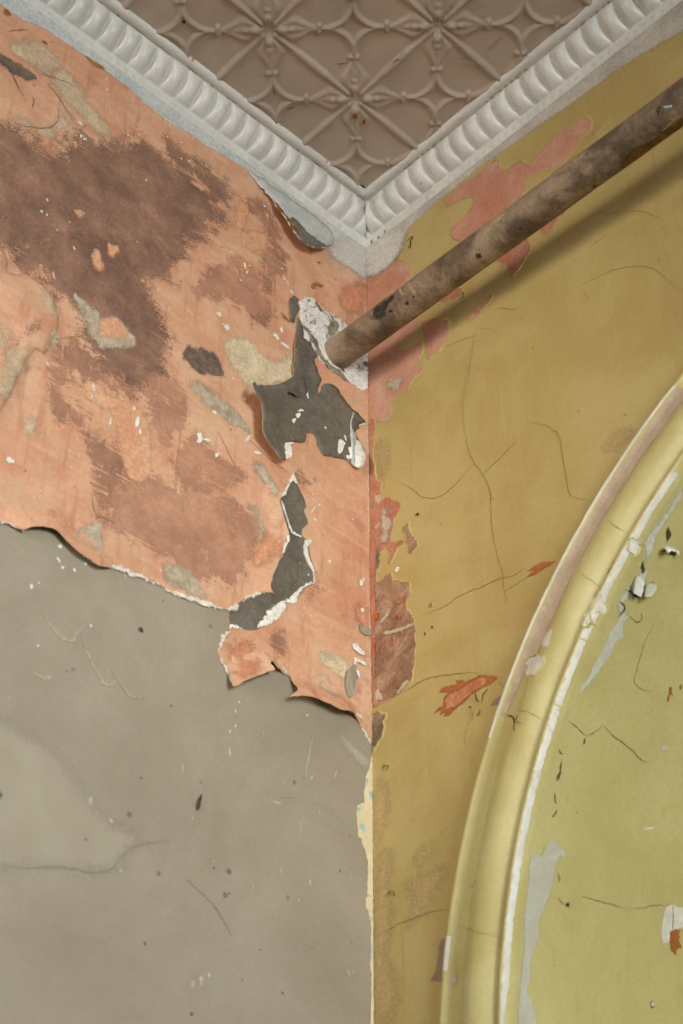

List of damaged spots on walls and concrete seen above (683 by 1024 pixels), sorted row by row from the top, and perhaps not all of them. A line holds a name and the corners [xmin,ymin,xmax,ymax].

peeling [444,115,604,242]
peeling [495,209,568,276]
damp [0,118,293,592]
peeling [0,4,451,1024]
crack [399,308,524,614]
peeling [434,385,683,738]
crack [535,423,586,500]
crack [631,614,655,692]
peeling [493,471,678,1024]
crack [568,721,651,762]
crack [586,897,663,910]
peeling [661,904,683,955]